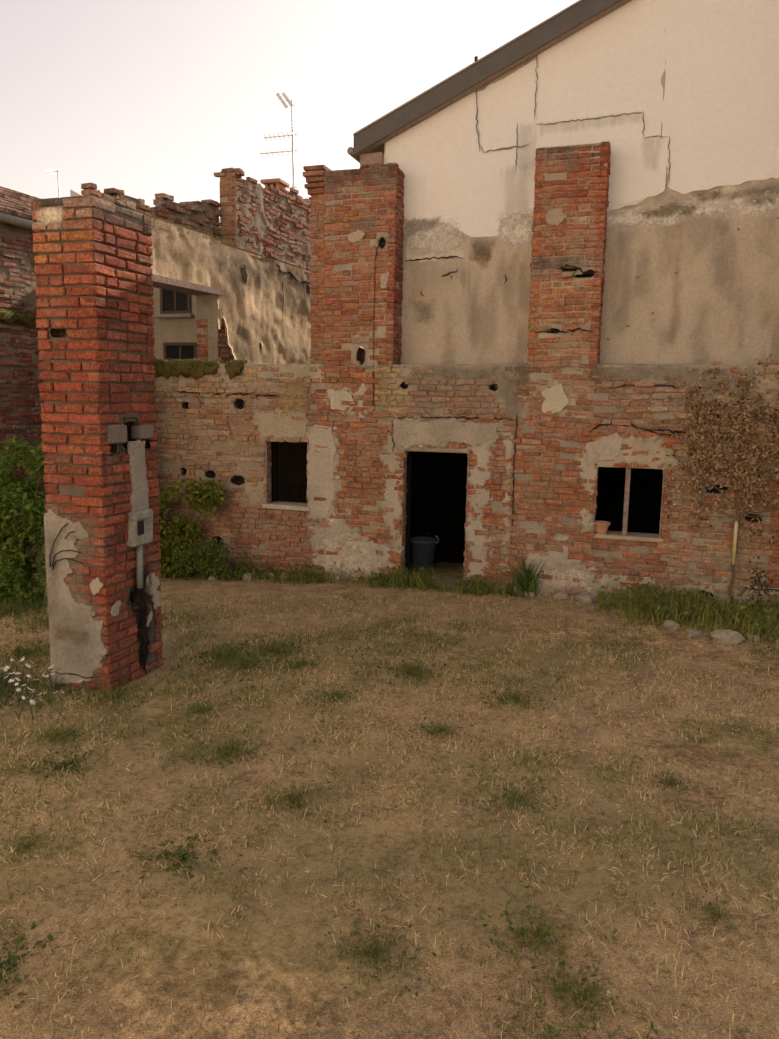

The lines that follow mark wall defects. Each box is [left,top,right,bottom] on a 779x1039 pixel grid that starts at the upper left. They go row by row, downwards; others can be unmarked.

water stain [606,190,779,231]
water stain [406,213,533,263]
crack [276,264,310,315]
crack [371,238,518,553]
peeling [541,384,569,414]
peeling [258,414,340,522]
peeling [586,438,633,463]
peeling [44,509,109,684]